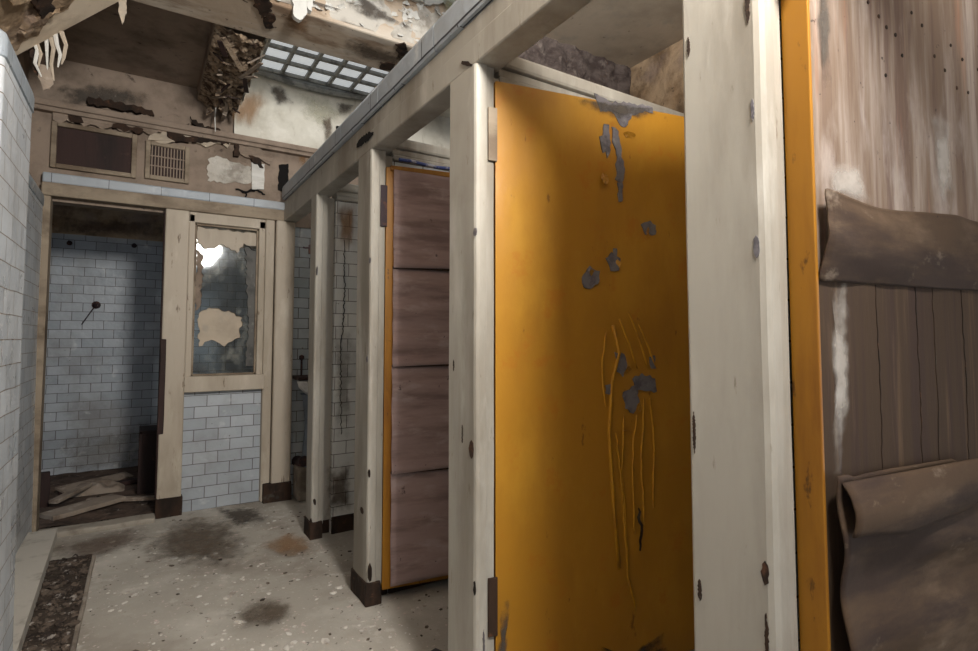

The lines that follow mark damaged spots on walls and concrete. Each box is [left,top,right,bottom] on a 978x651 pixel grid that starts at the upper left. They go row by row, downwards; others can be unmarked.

flaking render [0,0,74,51]
flaking render [253,0,362,29]
peeling [379,0,455,71]
flaking render [52,96,289,191]
peeling [195,226,257,366]
leakage [153,509,264,560]
leakage [242,602,288,623]